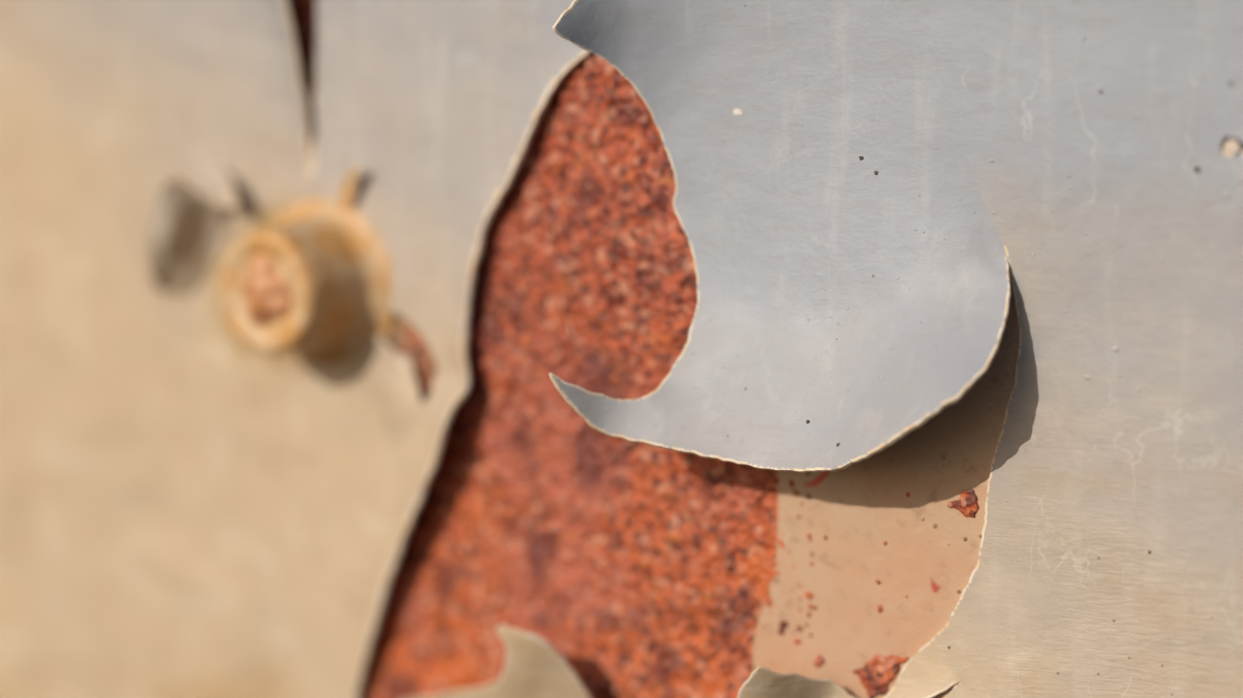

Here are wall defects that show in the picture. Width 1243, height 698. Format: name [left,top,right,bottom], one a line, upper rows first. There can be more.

corrosion [287,0,317,150]
crack [1220,135,1243,158]
corrosion [360,52,818,698]
peeling [312,0,1011,698]
corrosion [947,489,979,518]
corrosion [853,655,909,698]